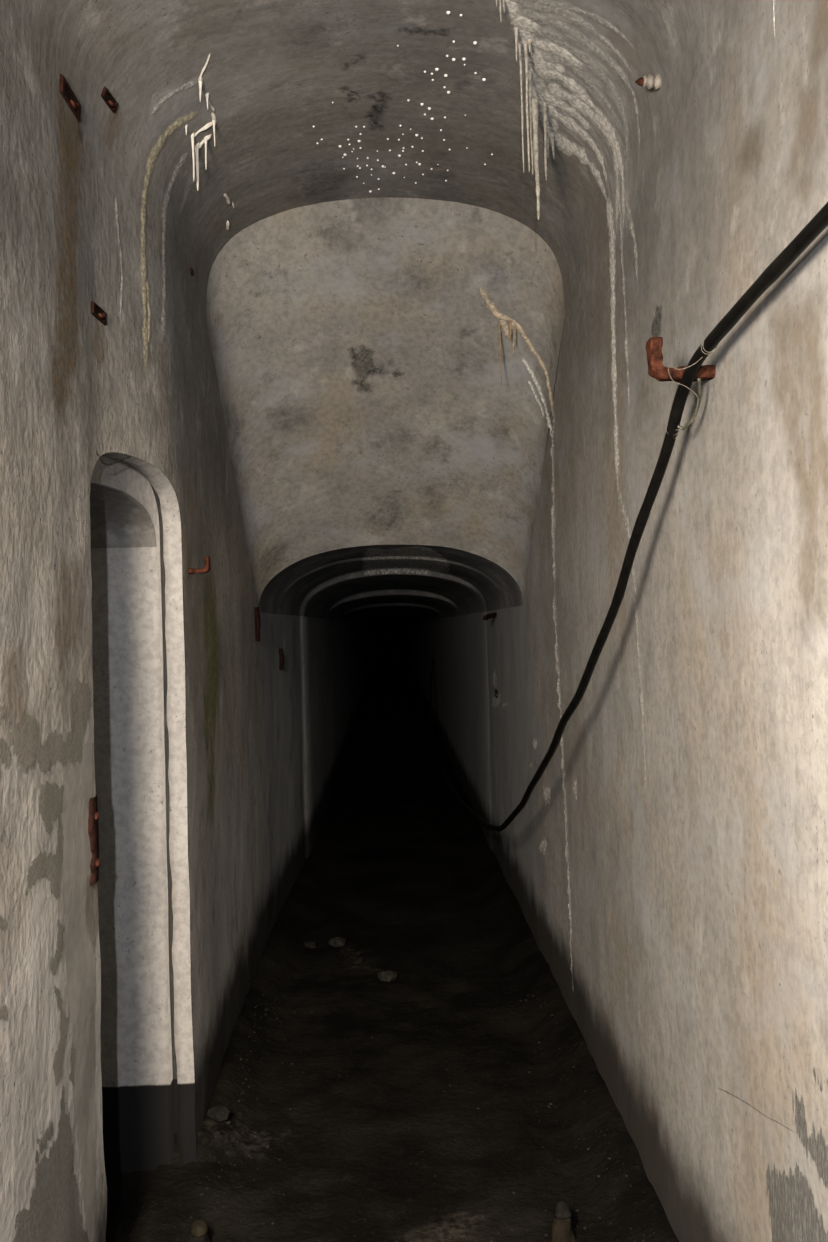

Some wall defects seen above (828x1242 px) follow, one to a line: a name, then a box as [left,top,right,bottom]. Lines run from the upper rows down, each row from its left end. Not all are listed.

water stain [142,54,217,357]
water stain [480,288,554,456]
water stain [510,0,639,539]
flaking render [0,677,91,900]
flaking render [13,921,88,1242]
flaking render [766,1089,828,1242]